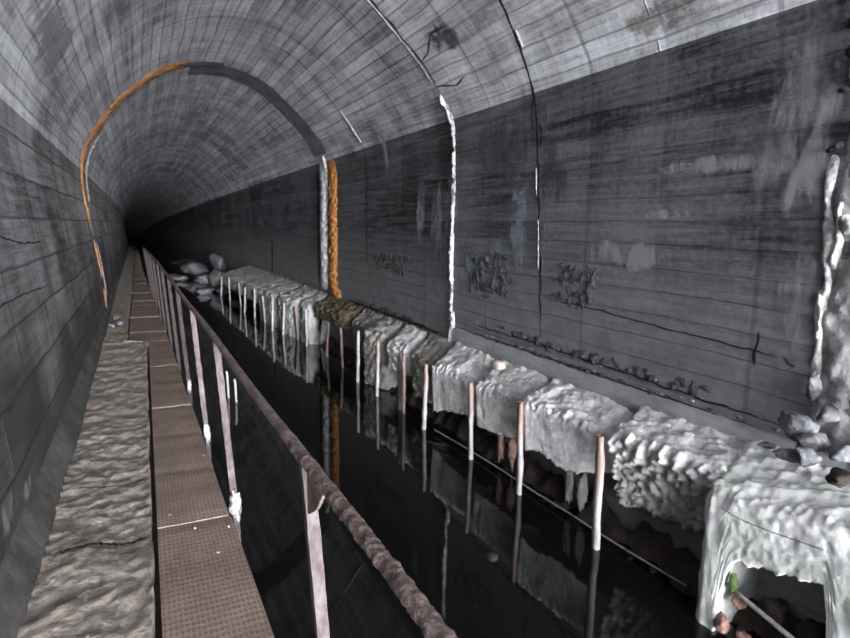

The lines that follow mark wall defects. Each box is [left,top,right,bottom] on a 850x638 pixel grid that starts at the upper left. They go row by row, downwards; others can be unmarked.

water stain [428,20,458,50]
corrosion [80,61,191,278]
water stain [179,62,329,290]
corrosion [327,159,342,298]
water stain [433,95,458,338]
spalling [462,247,523,299]
water stain [510,183,526,263]
spalling [550,262,605,310]
water stain [599,242,654,270]
crack [498,0,795,367]
water stain [669,47,844,377]
crack [58,537,146,554]